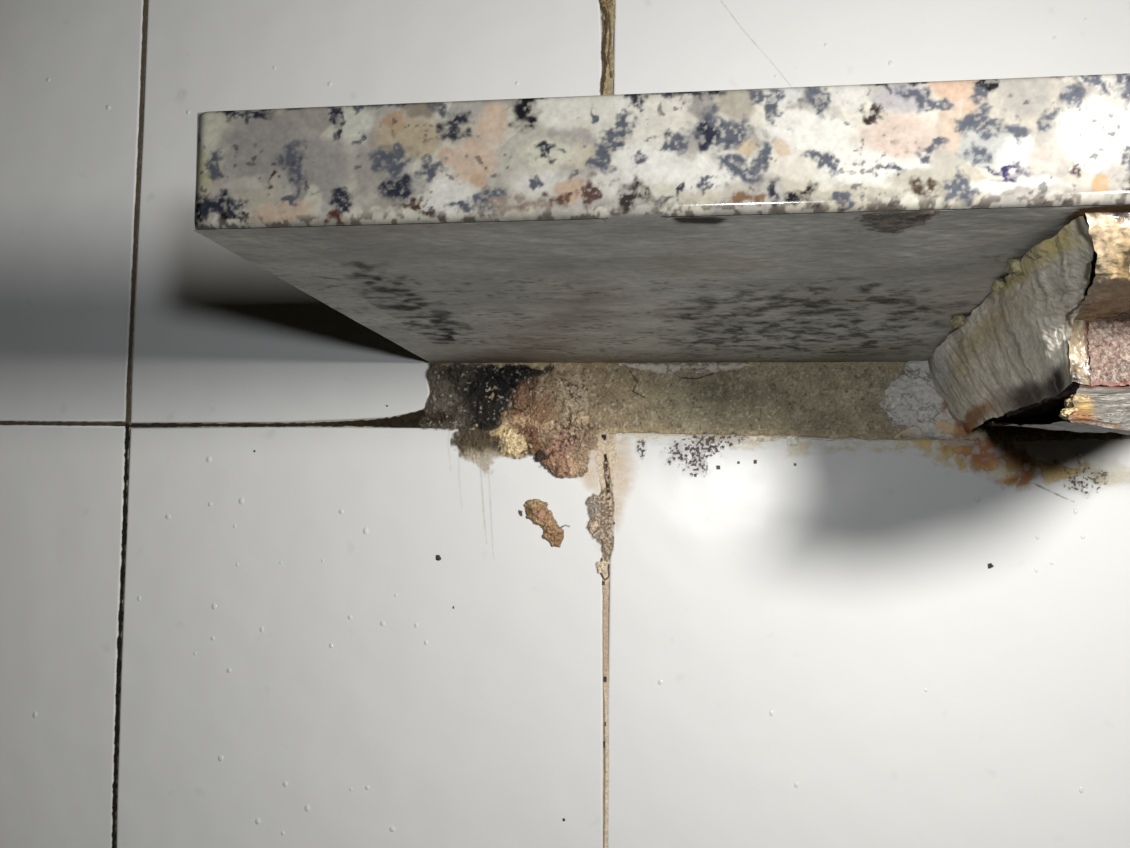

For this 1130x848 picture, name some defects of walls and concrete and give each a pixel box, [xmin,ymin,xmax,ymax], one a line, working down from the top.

leakage [418,363,554,463]
peeling [880,361,974,439]
peeling [986,385,1130,435]
rust [918,438,1081,486]
flaking render [518,499,569,547]